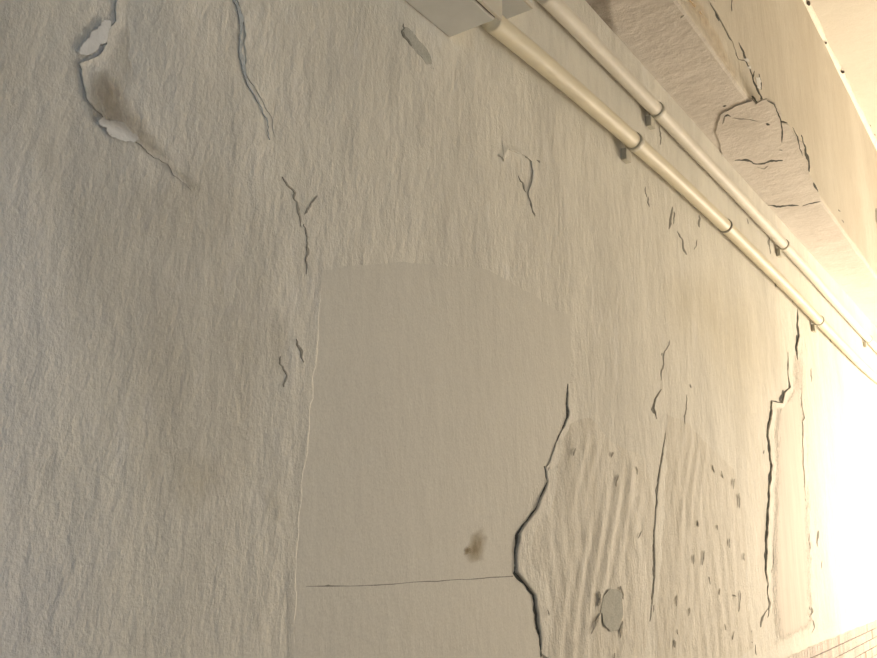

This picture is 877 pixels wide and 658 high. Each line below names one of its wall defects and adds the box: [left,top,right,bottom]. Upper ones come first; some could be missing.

crack [709,0,844,223]
crack [306,383,581,658]
crack [751,309,812,655]